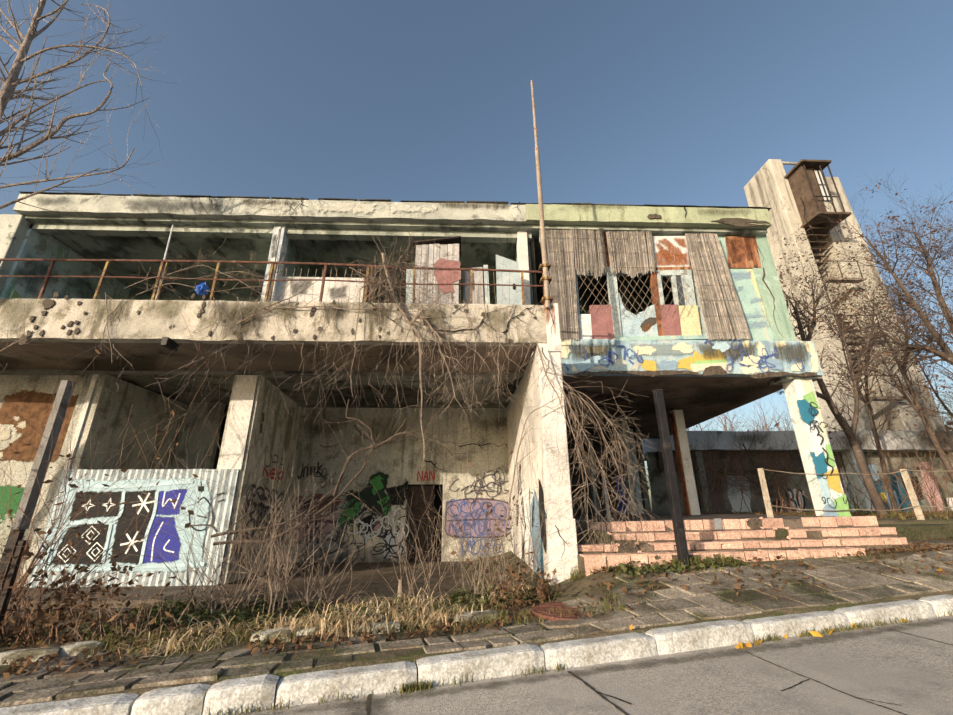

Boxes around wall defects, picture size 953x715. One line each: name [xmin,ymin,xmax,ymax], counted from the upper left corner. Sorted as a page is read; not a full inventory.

water stain [130,199,220,211]
crack [754,168,796,337]
crack [800,198,827,278]
spalling [19,279,91,345]
spalling [0,390,57,462]
spalling [50,395,79,463]